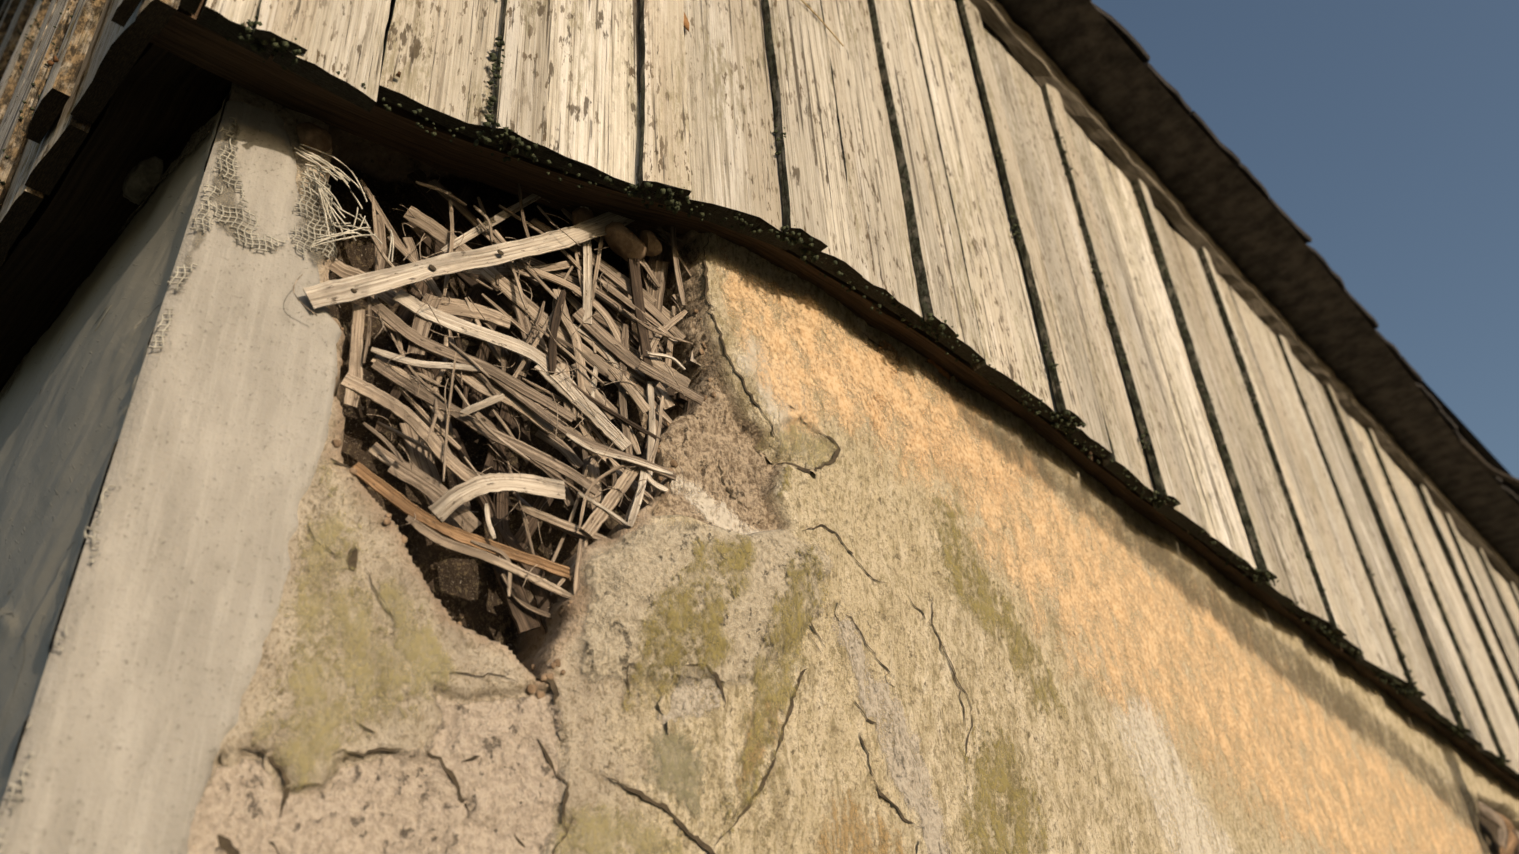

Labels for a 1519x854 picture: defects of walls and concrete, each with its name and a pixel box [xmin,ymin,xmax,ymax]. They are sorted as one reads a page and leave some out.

spalling [296,122,332,155]
spalling [293,169,837,634]
crack [308,522,397,625]
crack [242,719,480,854]
crack [431,671,560,704]
crack [514,739,578,854]
crack [608,615,890,854]
crack [854,700,921,828]
crack [806,524,973,775]